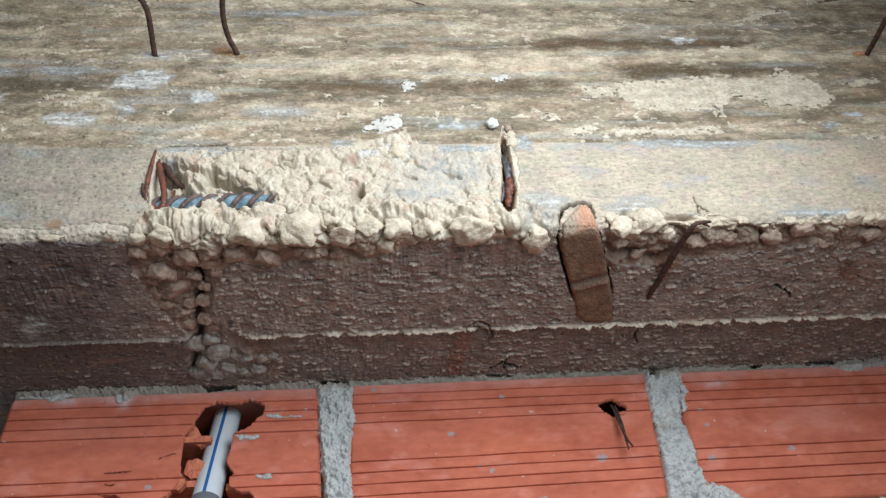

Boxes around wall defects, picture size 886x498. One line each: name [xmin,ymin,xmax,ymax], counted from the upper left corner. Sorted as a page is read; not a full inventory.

peeling [579,67,836,137]
spalling [0,79,560,272]
hole [169,426,213,498]
hole [222,468,253,498]